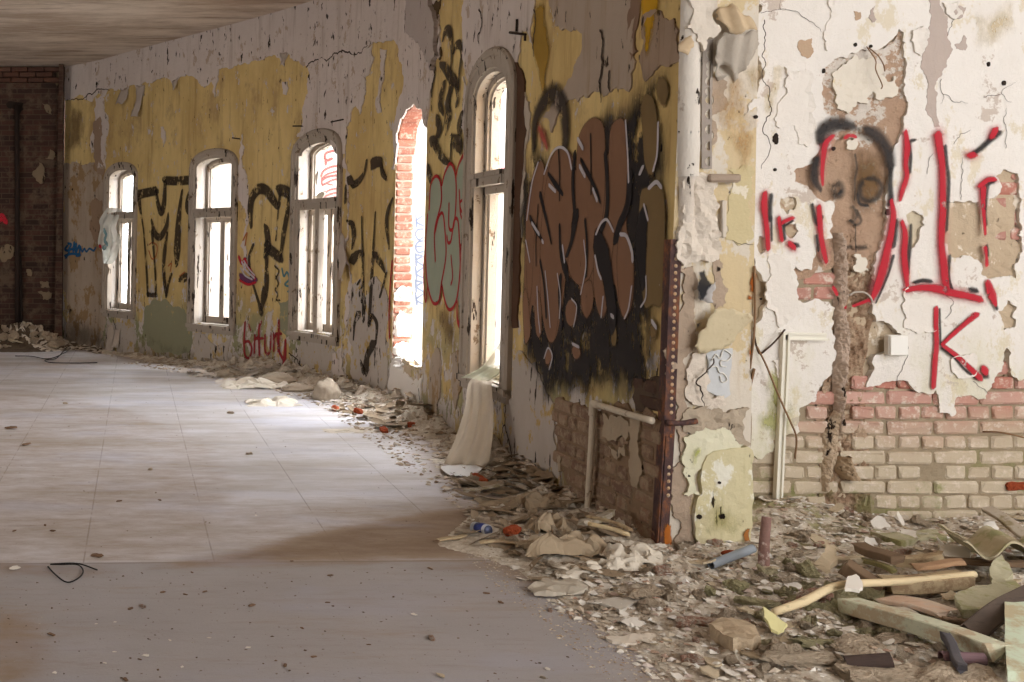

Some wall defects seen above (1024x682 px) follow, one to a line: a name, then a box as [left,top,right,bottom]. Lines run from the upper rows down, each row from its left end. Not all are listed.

crack [306,45,368,68]
crack [761,1,821,169]
crack [940,80,1011,147]
flaking render [63,0,462,416]
flaking render [503,0,1024,546]
corrosion [665,418,698,437]
corrosion [664,524,672,545]